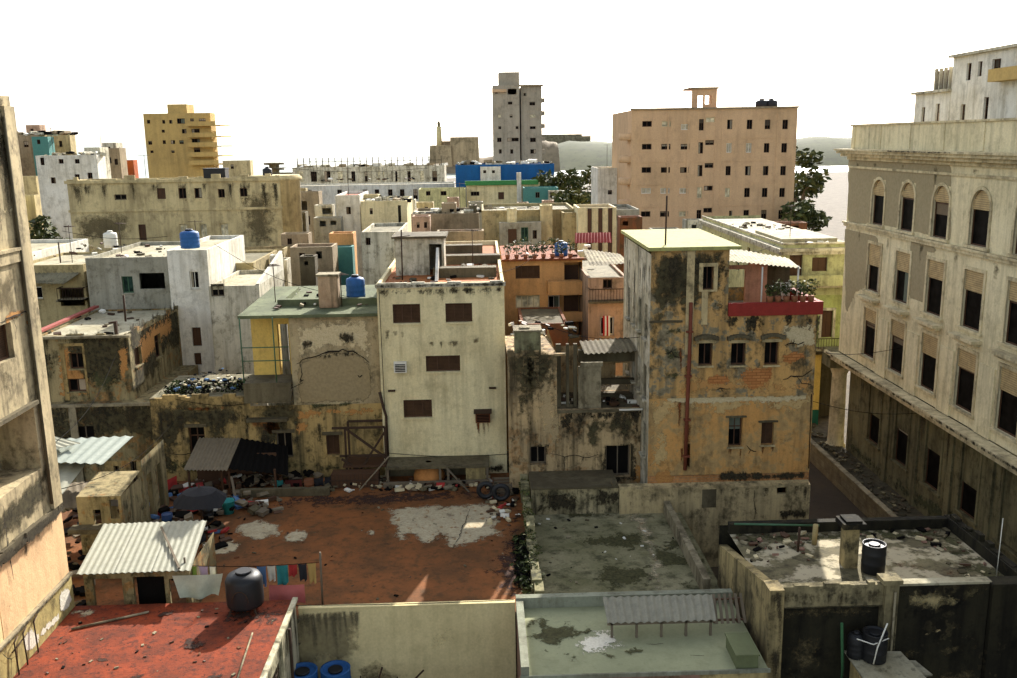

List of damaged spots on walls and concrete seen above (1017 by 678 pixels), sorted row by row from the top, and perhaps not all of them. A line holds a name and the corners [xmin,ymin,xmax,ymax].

damp [0,125,10,213]
damp [65,304,179,393]
peeling [295,320,371,358]
damp [511,346,553,413]
damp [629,252,729,333]
damp [727,316,764,334]
spalling [782,324,816,364]
damp [51,401,299,473]
peeling [633,367,811,483]